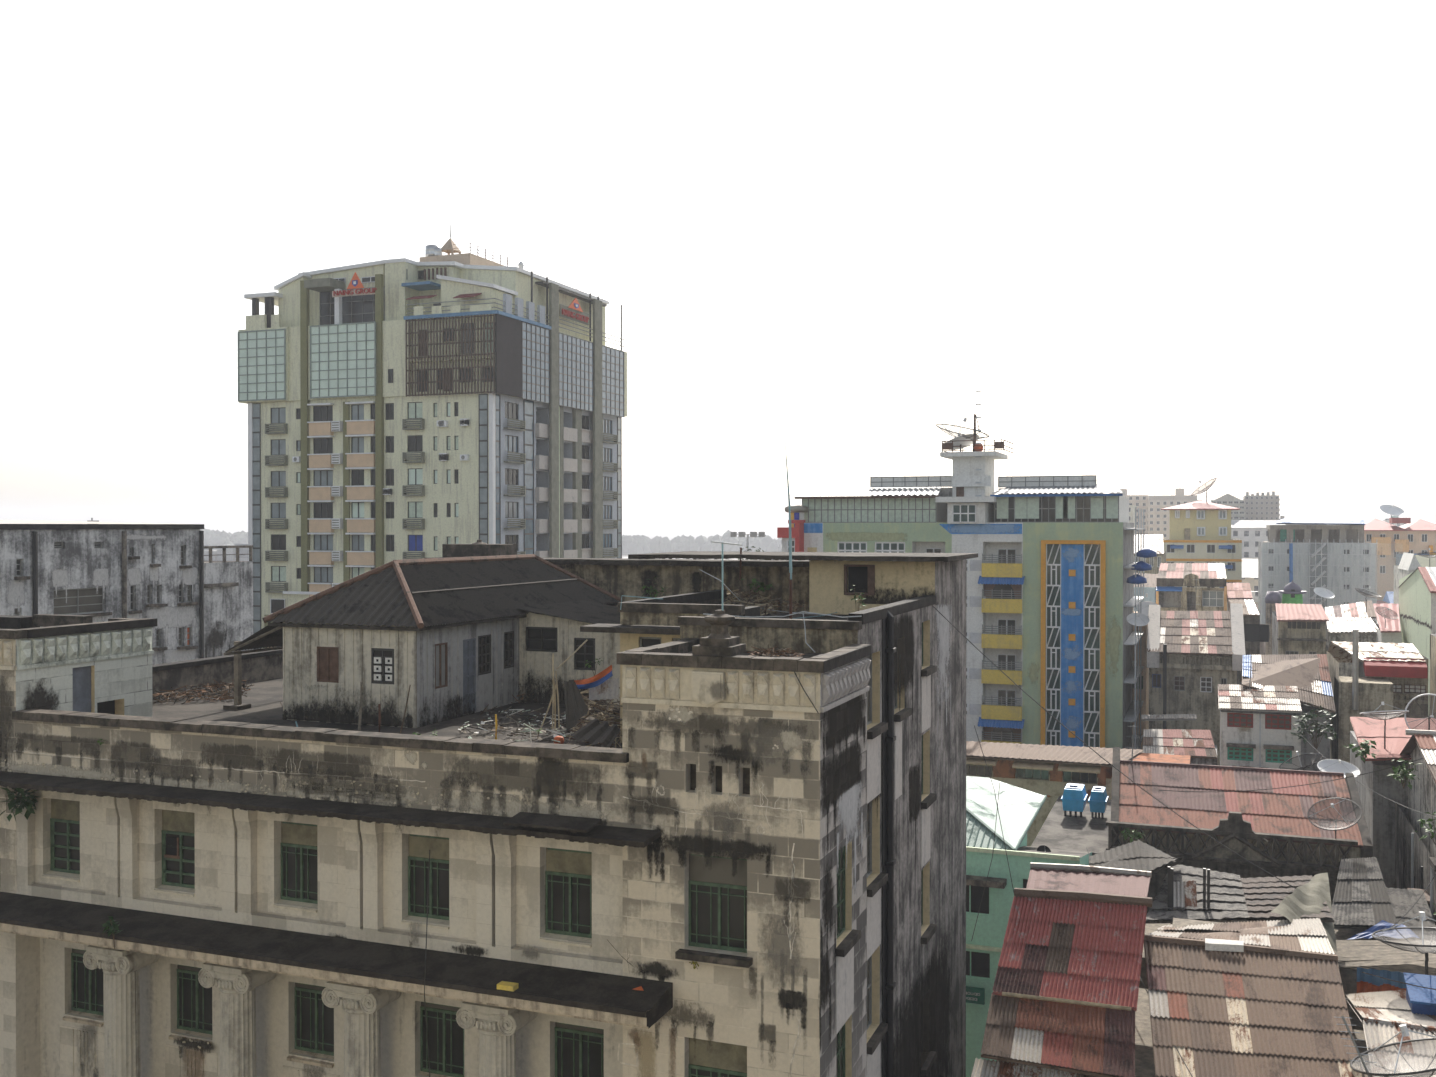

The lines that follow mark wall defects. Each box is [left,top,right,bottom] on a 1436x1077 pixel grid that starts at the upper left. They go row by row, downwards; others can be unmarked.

damp [0,681,425,807]
damp [205,620,230,658]
damp [442,757,601,815]
damp [710,683,727,699]
damp [859,589,952,749]
damp [909,765,920,863]
damp [623,689,883,1077]
damp [893,936,952,1077]